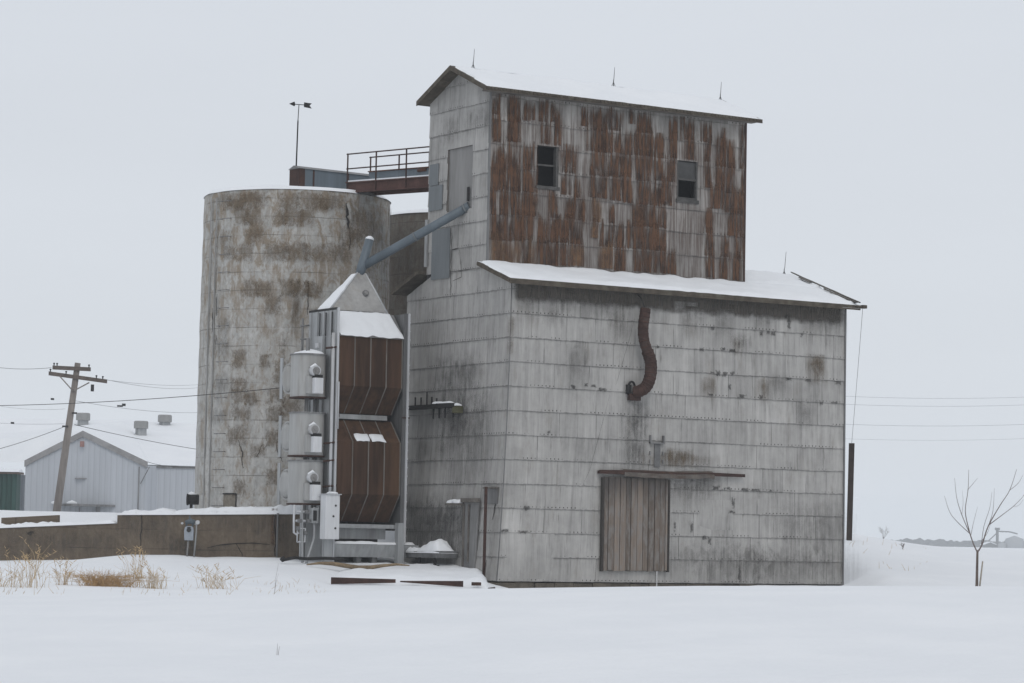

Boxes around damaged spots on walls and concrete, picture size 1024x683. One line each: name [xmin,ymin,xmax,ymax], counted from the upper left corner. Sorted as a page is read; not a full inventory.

crack [344,203,352,250]
rust [490,94,745,281]